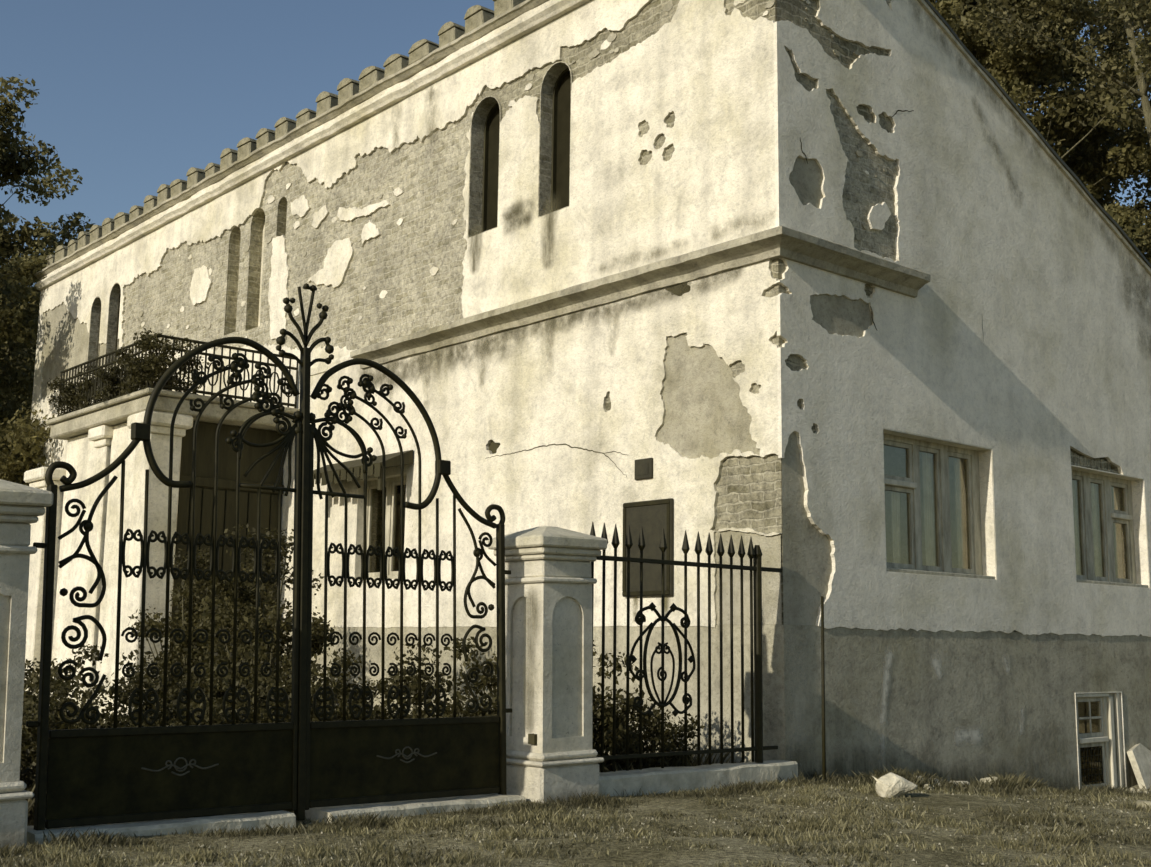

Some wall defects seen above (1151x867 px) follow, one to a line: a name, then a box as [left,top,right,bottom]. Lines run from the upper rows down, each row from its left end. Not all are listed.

flaking render [726,0,889,69]
flaking render [785,49,897,261]
flaking render [42,0,680,398]
flaking render [668,283,691,296]
spalling [764,259,789,297]
flaking render [810,284,873,338]
crack [485,444,627,477]
flaking render [657,333,832,626]